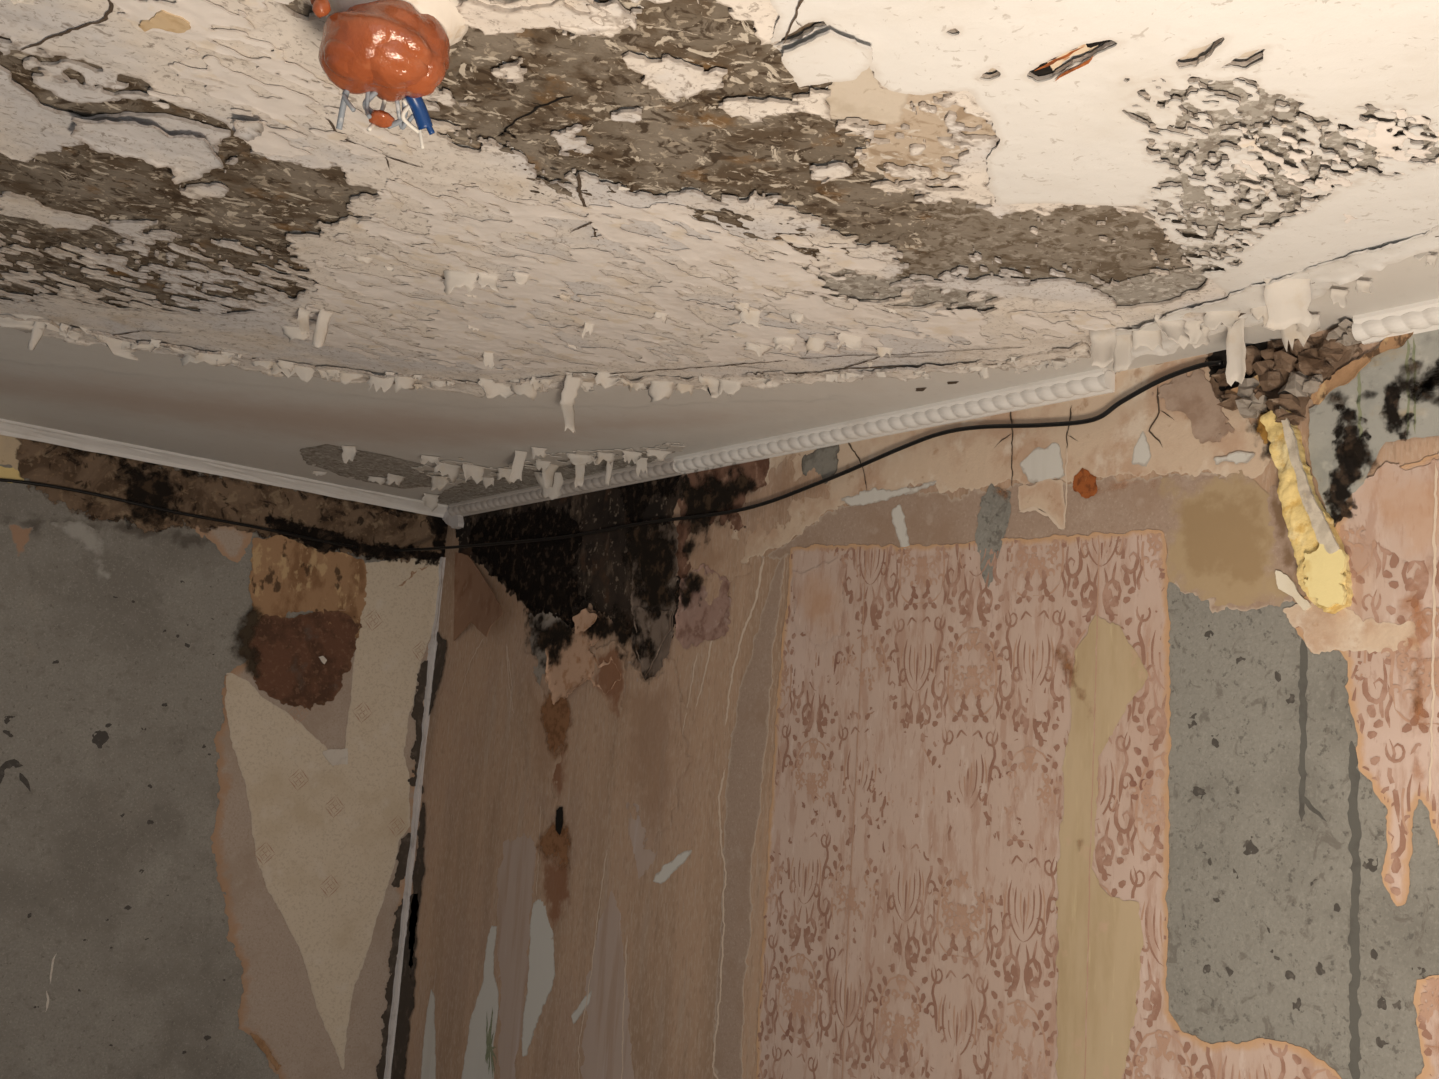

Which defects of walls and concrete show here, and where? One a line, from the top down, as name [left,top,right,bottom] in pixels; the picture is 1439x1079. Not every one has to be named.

crack [20,0,114,51]
flaking render [232,608,362,711]
damp [0,438,830,854]
peeling [0,0,1439,588]
spalling [1165,582,1439,1079]
damp [1323,358,1439,564]